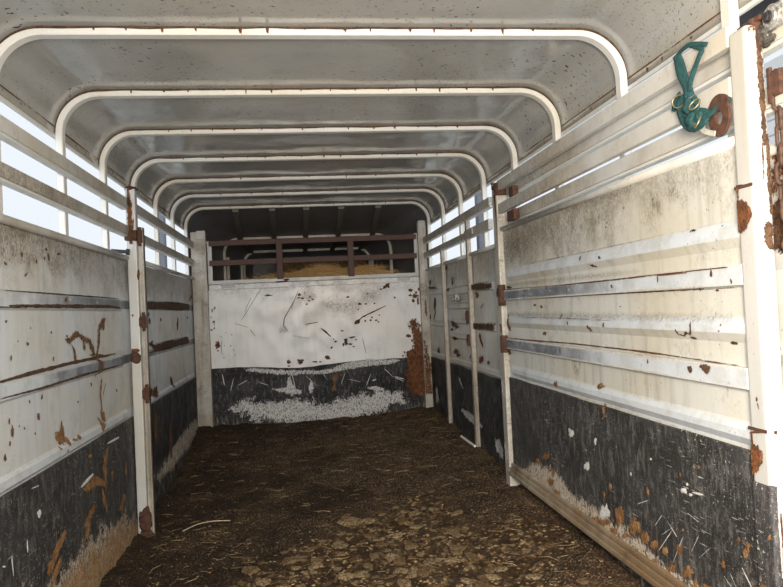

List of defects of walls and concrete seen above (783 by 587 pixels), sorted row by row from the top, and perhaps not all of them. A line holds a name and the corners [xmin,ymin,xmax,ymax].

rust [0,84,616,230]
rust [748,25,783,250]
rust [408,280,436,320]
rust [466,267,734,308]
rust [0,353,116,383]
rust [2,364,123,399]
rust [403,318,440,398]
rust [470,315,737,366]
rust [750,431,777,476]